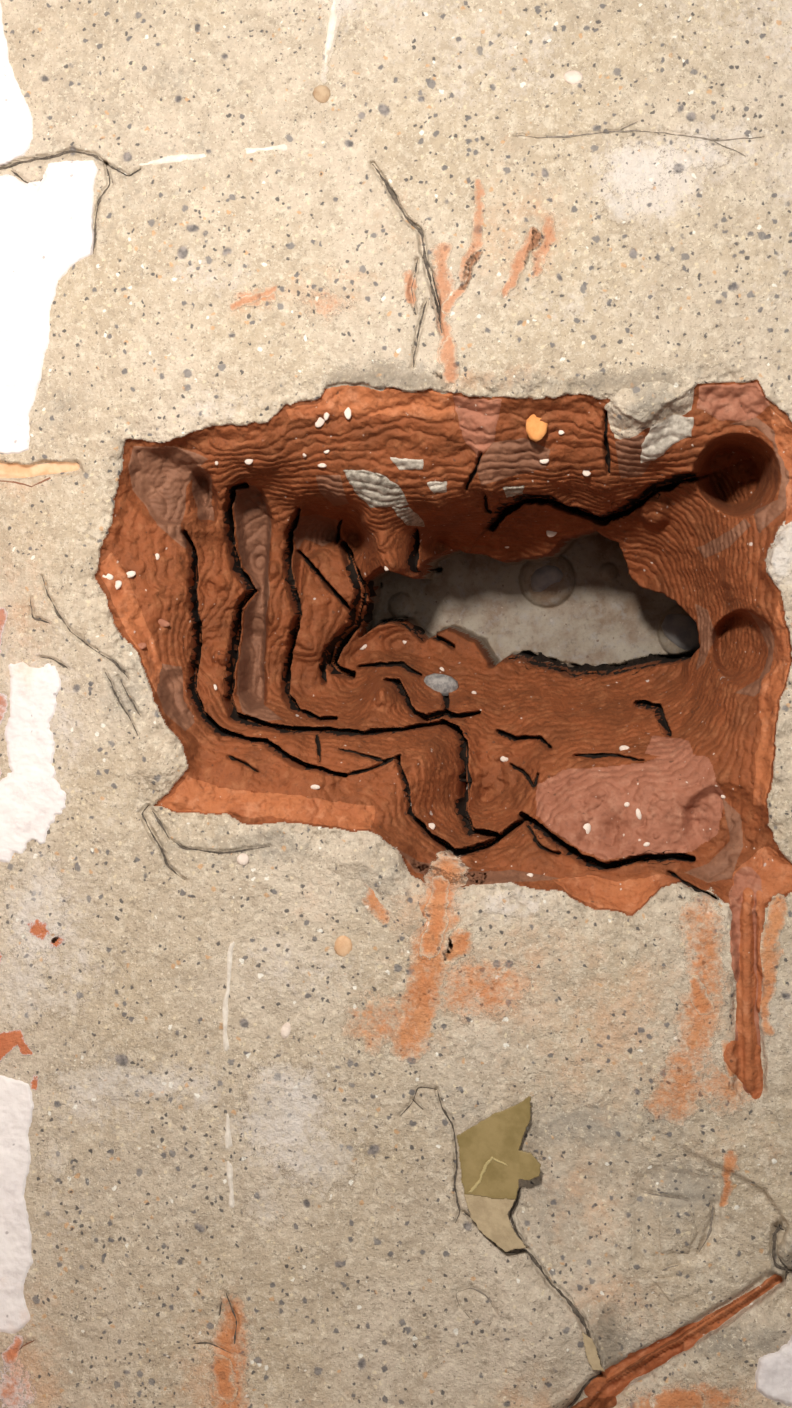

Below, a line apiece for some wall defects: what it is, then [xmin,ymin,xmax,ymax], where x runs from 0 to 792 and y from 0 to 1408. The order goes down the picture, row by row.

peeling [0,3,98,454]
crack [0,150,141,254]
crack [372,164,443,367]
rust [401,178,486,384]
spalling [95,380,792,916]
peeling [0,662,66,863]
crack [141,805,270,880]
rust [339,849,536,1063]
rust [642,887,760,1128]
rust [206,1292,254,1408]
crack [400,1087,601,1408]
peeling [755,1336,792,1407]